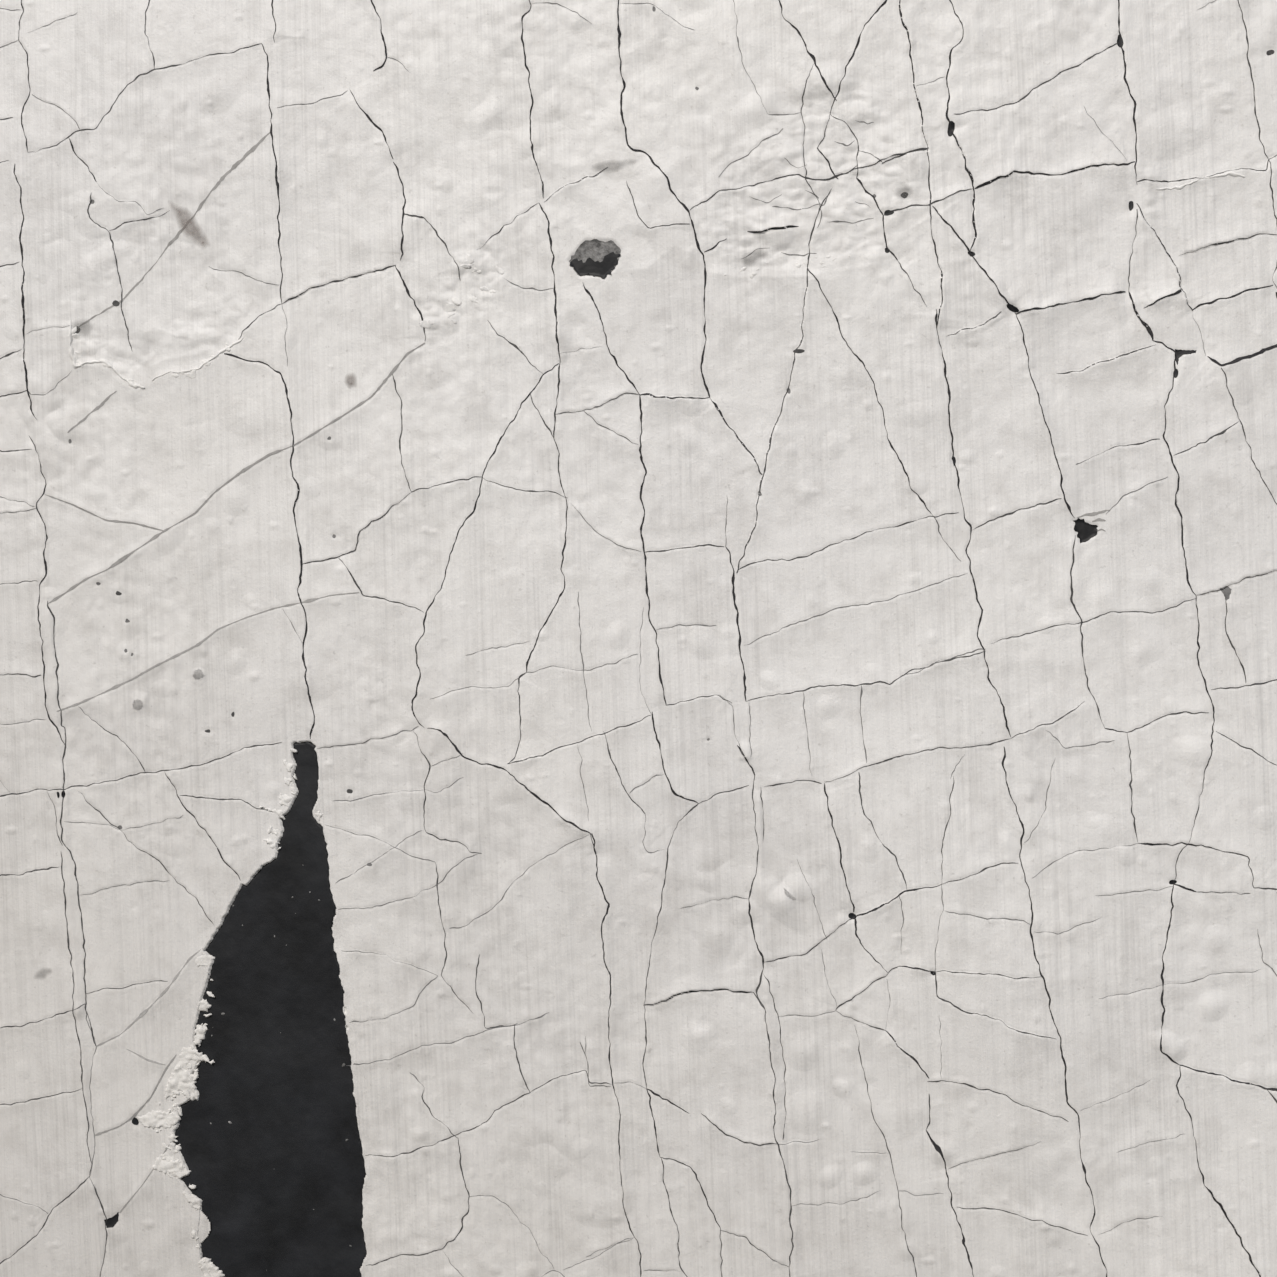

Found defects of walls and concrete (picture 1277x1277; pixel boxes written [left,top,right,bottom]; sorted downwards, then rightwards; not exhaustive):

crack [0,160,70,417]
crack [229,43,423,337]
crack [278,90,460,279]
crack [477,0,608,274]
spalling [569,239,621,279]
crack [571,0,1197,1132]
spalling [1074,510,1109,543]
crack [0,278,756,1277]
crack [1070,204,1277,1277]
peeling [137,742,367,1277]
crack [640,821,835,1277]
crack [926,1095,1107,1277]